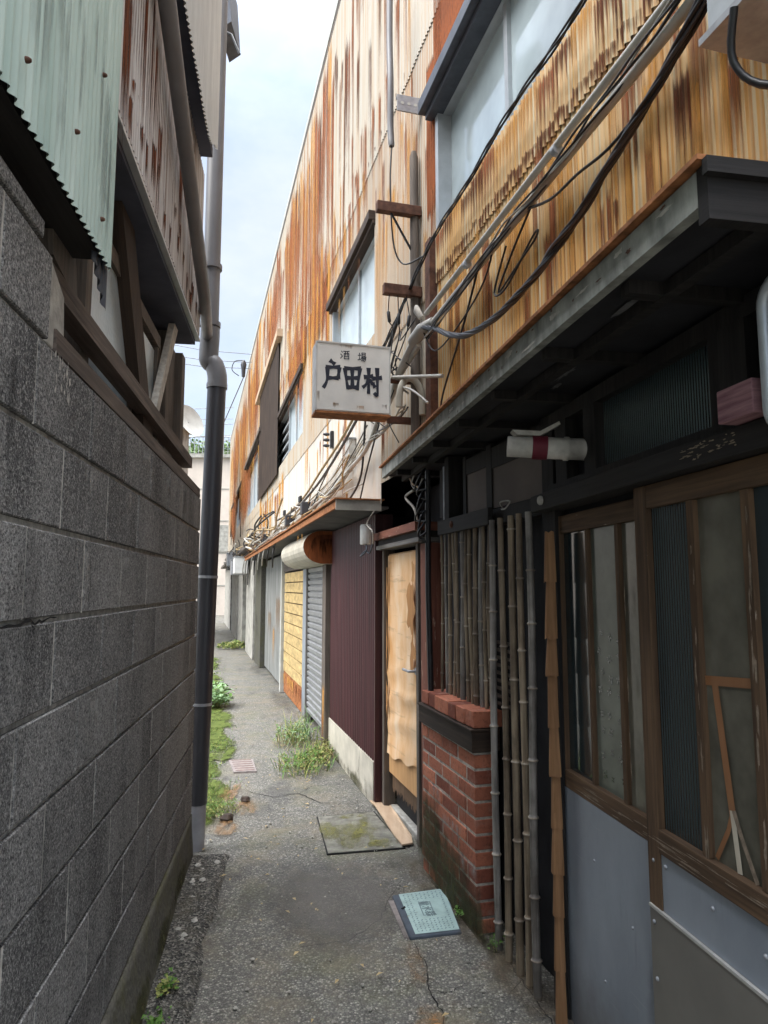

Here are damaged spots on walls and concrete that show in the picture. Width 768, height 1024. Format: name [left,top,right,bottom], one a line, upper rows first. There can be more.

corrosion [118,0,184,261]
corrosion [186,279,197,312]
corrosion [230,0,399,537]
corrosion [397,0,677,386]
corrosion [673,18,746,157]
crack [414,943,463,1024]